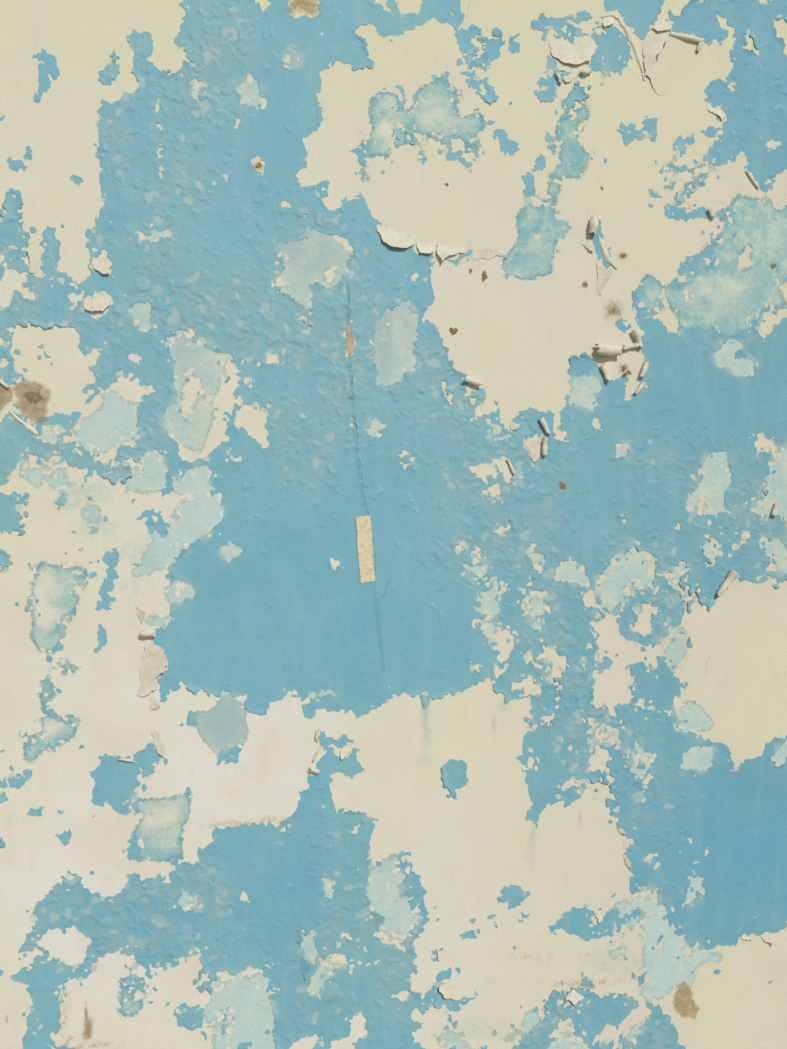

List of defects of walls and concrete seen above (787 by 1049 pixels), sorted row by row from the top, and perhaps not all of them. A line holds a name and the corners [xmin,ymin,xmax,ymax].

water stain [289,0,316,14]
peeling [7,146,32,172]
peeling [669,230,719,290]
crack [346,283,391,671]
peeling [0,491,30,535]
peeling [136,509,182,538]
peeling [73,548,119,611]
peeling [94,624,108,654]
peeling [0,765,32,803]
peeling [89,729,168,817]
peeling [216,746,242,765]
peeling [505,972,686,1049]